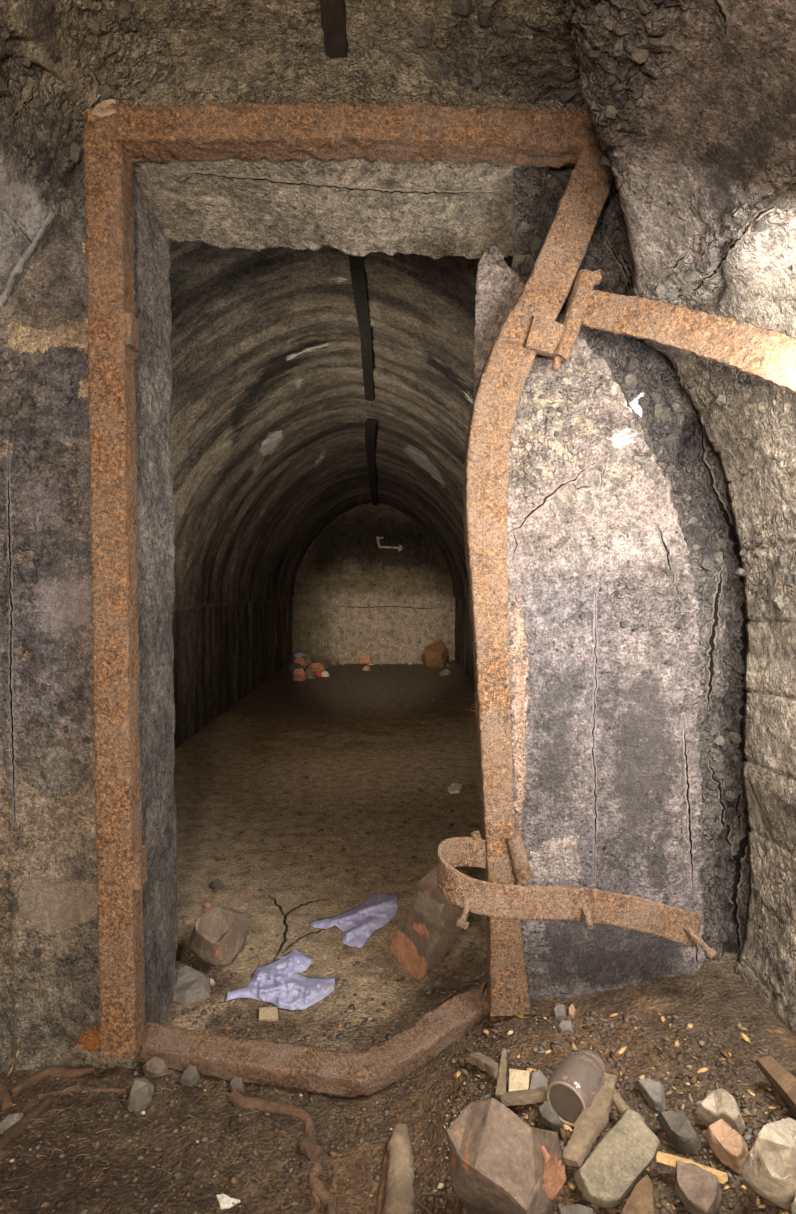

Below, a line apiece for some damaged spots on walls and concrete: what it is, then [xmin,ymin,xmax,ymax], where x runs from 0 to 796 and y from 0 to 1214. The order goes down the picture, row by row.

crack [507,449,607,559]
crack [655,356,750,973]
crack [269,895,330,961]